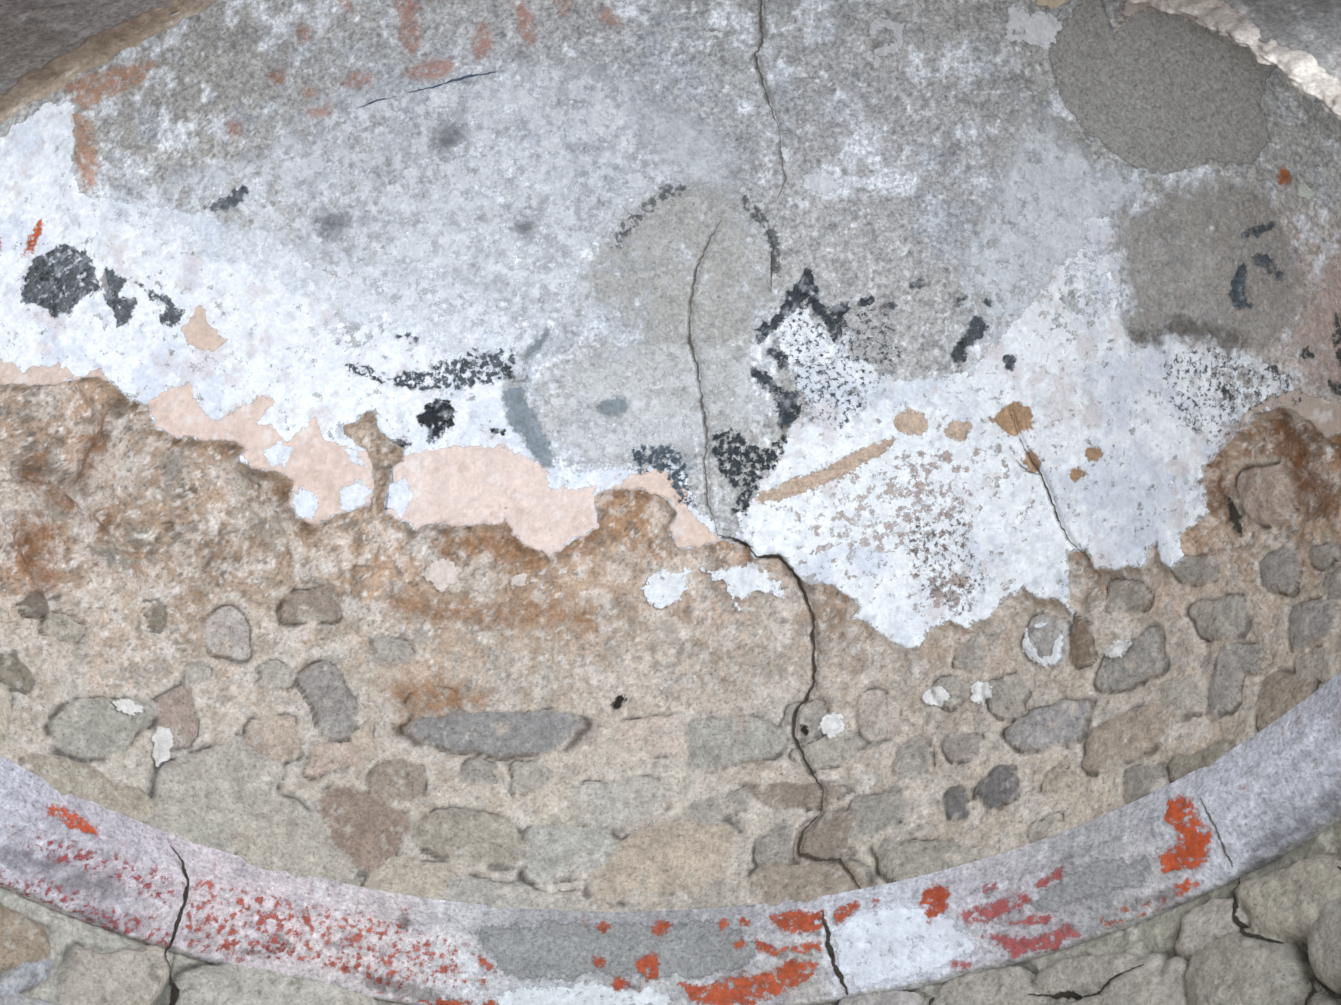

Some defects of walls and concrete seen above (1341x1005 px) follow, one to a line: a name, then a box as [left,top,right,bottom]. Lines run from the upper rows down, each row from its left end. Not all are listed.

peeling [1004,0,1071,52]
crack [753,0,787,200]
corrosion [23,219,42,255]
peeling [263,440,294,469]
peeling [755,440,893,504]
peeling [990,401,1033,436]
crack [688,218,861,889]
corrosion [1100,796,1212,929]
crack [164,845,189,1005]
corrosion [677,899,880,1005]
crack [822,911,848,1005]
corrosion [919,866,1081,958]